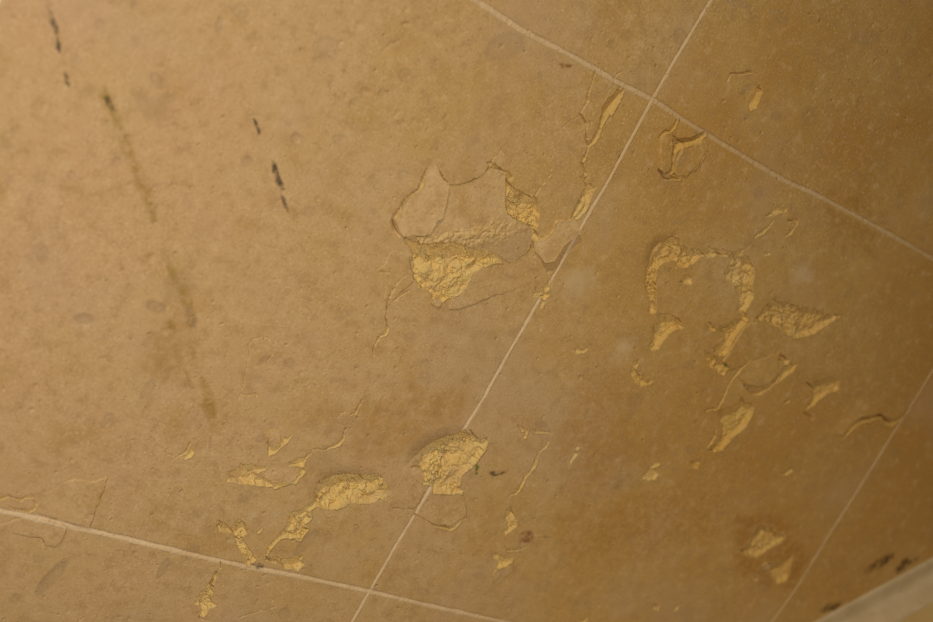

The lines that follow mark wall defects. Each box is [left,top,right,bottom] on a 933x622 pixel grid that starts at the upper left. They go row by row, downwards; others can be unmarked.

spalling [375,145,581,313]
spalling [628,235,844,389]
spalling [689,395,756,471]
spalling [801,375,841,422]
crack [841,410,911,441]
spalling [213,429,491,573]
spalling [191,561,224,622]
spalling [735,522,795,587]